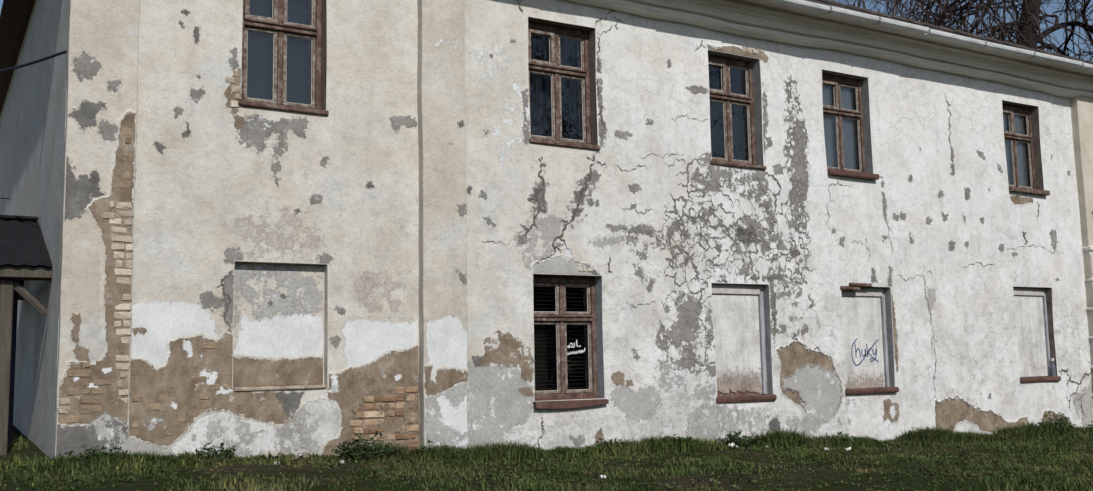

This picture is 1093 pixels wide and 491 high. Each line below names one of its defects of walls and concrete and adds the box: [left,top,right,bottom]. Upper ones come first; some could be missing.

peeling [71,50,102,81]
peeling [173,47,309,186]
crack [946,98,954,167]
flaking render [56,79,534,459]
crack [481,10,937,400]
flaking render [609,76,857,426]
flaking render [881,395,901,427]
flaking render [933,393,1073,435]